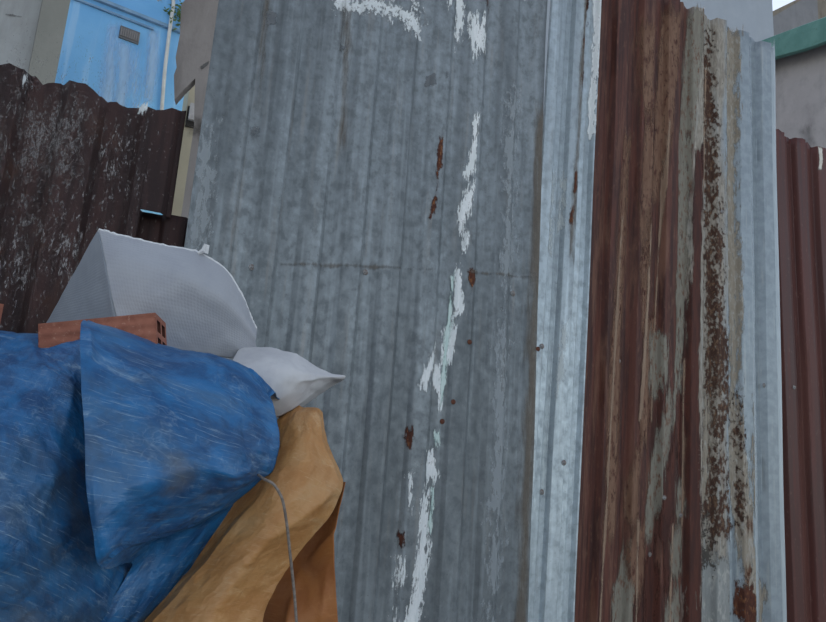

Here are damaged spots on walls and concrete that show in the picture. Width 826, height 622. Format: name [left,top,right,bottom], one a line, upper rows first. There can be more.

rust [633,20,753,622]
rust [404,425,415,450]
rust [733,564,757,622]